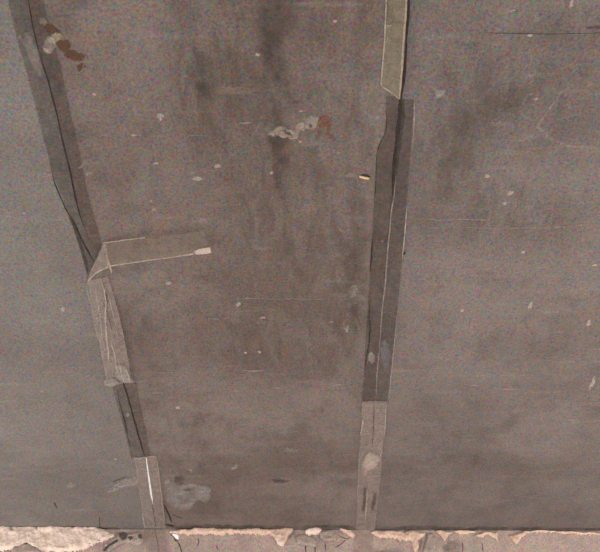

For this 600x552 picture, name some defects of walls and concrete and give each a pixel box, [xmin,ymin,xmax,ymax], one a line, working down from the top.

rust [39,17,86,72]
crack [28,0,95,270]
peeling [268,110,336,143]
crack [361,0,410,200]
crack [364,305,372,368]
crack [117,381,145,457]